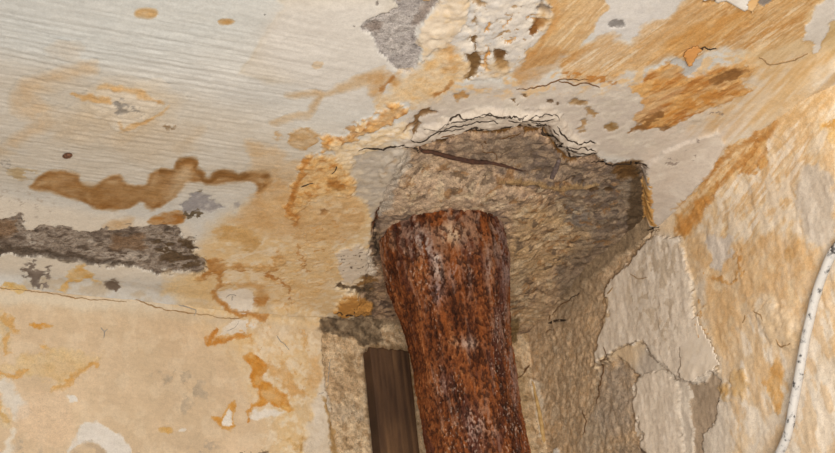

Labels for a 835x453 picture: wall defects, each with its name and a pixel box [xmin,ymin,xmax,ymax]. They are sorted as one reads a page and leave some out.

peeling [702,0,773,14]
peeling [352,0,560,84]
damp [267,64,393,128]
flaking render [453,90,470,103]
damp [0,39,302,245]
crack [359,113,648,168]
damp [818,119,835,176]
flaking render [0,189,241,292]
peeling [594,226,722,453]